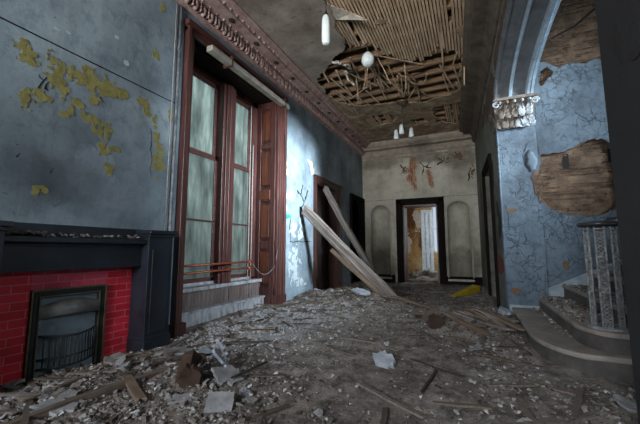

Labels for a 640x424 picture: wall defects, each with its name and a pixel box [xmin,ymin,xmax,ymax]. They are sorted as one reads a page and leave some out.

spalling [323,0,464,126]
flaking render [539,0,601,86]
peeling [12,37,166,182]
flaking render [531,138,616,217]
peeling [408,210,421,253]
crack [505,205,579,267]